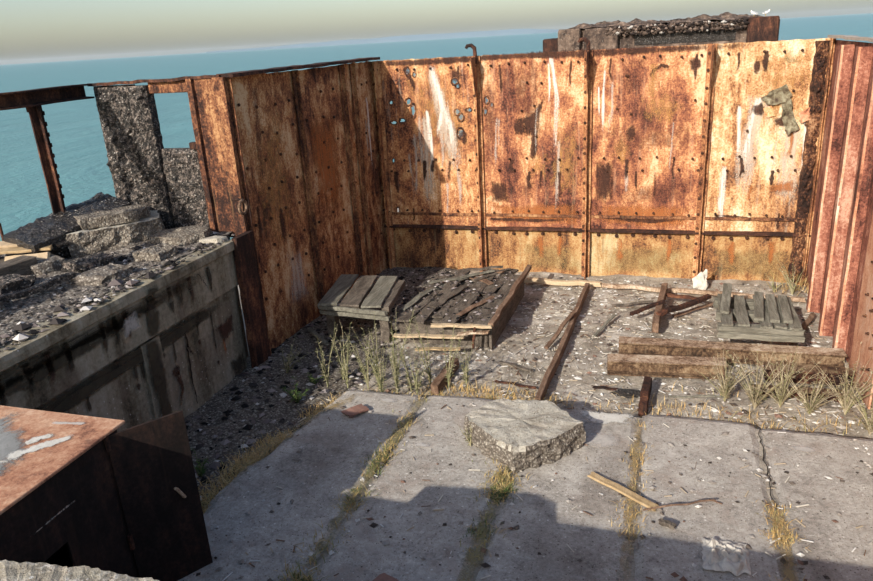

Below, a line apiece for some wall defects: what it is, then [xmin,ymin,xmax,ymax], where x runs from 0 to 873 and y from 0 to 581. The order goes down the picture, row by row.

water stain [417,68,455,198]
corrosion [385,44,706,226]
water stain [548,58,559,141]
peeling [763,98,810,135]
corrosion [752,40,830,283]
water stain [0,276,217,416]
crack [758,427,777,516]